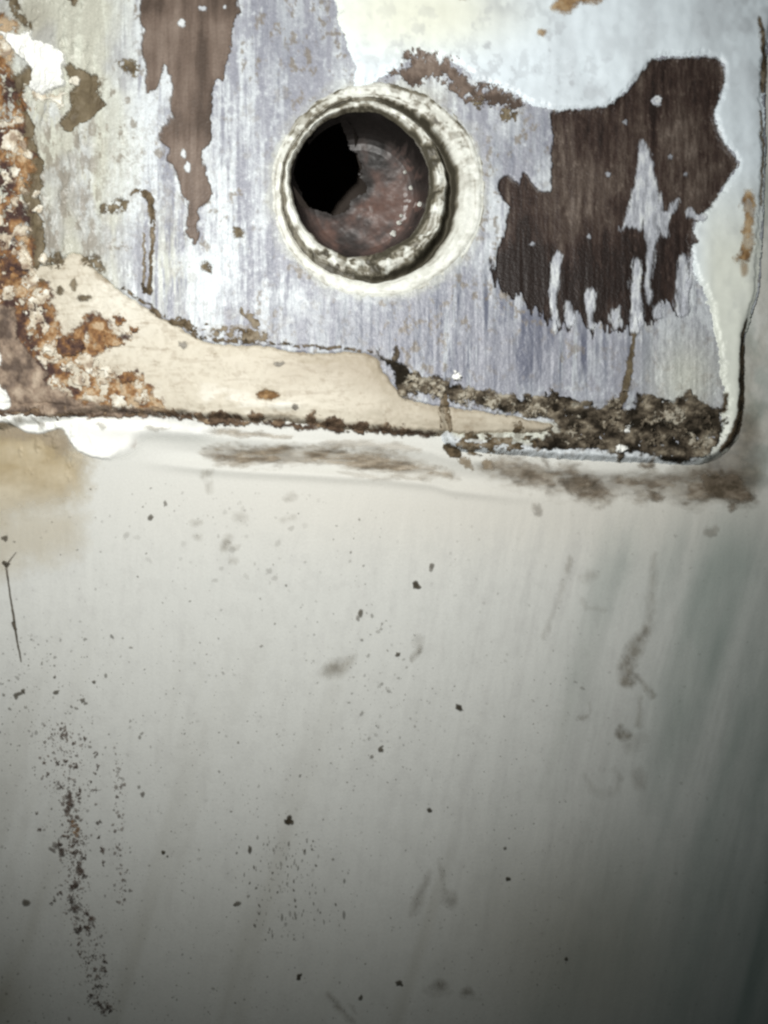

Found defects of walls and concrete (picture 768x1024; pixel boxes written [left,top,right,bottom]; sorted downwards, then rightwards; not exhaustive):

peeling [59,63,106,132]
peeling [118,0,241,244]
corrosion [0,13,439,437]
peeling [489,57,737,339]
corrosion [736,191,756,261]
spalling [57,279,91,301]
peeling [81,254,105,272]
spalling [256,390,279,400]
water stain [212,446,451,476]
water stain [459,457,753,511]
corrosion [39,728,94,941]